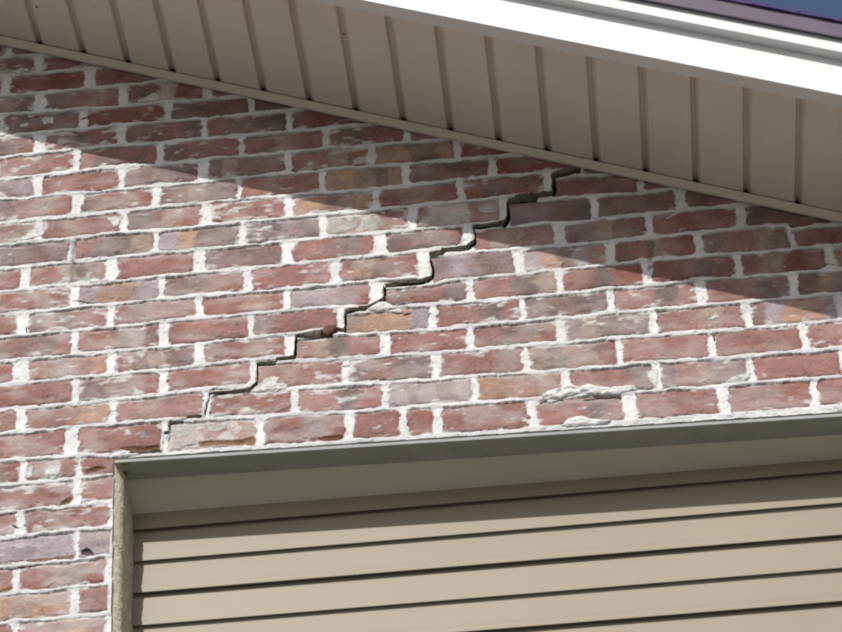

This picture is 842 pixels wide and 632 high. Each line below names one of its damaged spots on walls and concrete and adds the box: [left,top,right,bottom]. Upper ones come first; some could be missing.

crack [129,166,581,454]